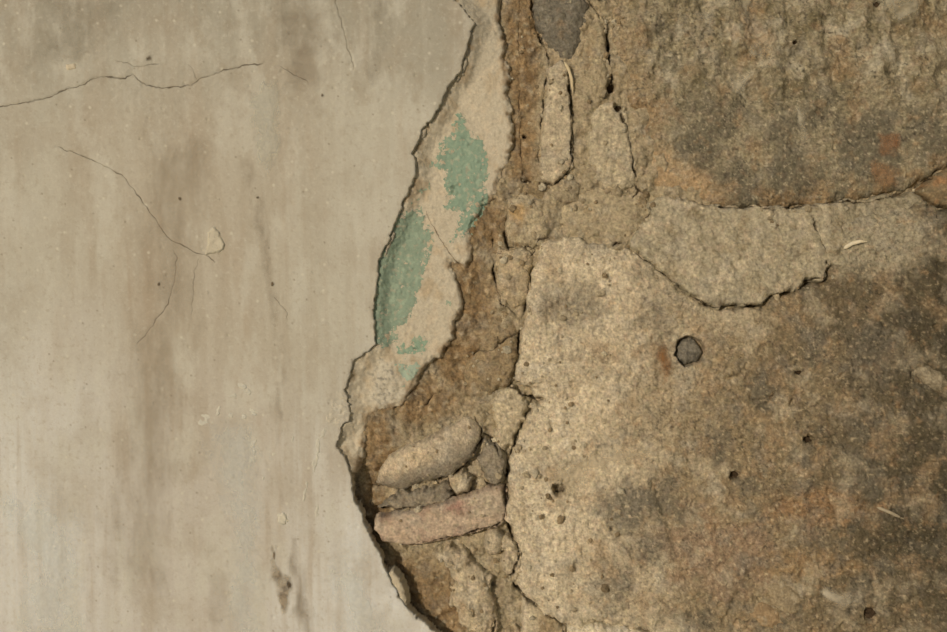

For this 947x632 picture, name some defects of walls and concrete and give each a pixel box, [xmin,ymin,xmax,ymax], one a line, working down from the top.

spalling [338,0,514,474]
crack [613,117,944,309]
spalling [912,366,947,391]
spalling [388,565,411,605]